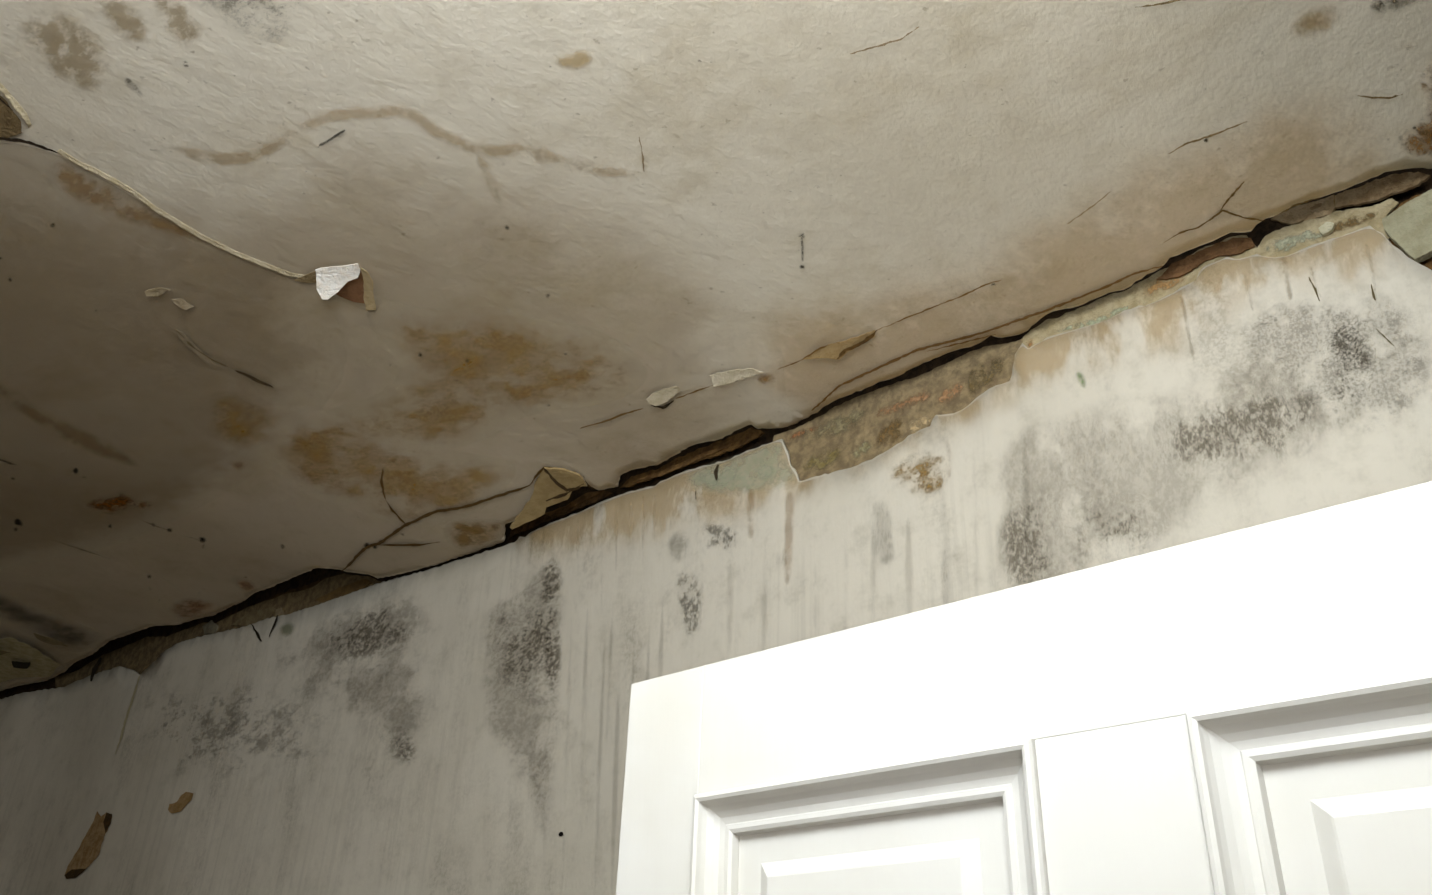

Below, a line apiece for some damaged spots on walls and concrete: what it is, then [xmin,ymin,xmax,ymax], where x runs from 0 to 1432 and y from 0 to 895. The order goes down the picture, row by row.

crack [851,27,919,54]
spalling [0,82,31,138]
rust [1408,114,1432,154]
peeling [57,149,376,310]
spalling [773,189,1432,481]
leakage [1332,328,1368,371]
crack [0,168,1432,754]
leakage [508,615,558,675]
spalling [64,811,112,879]